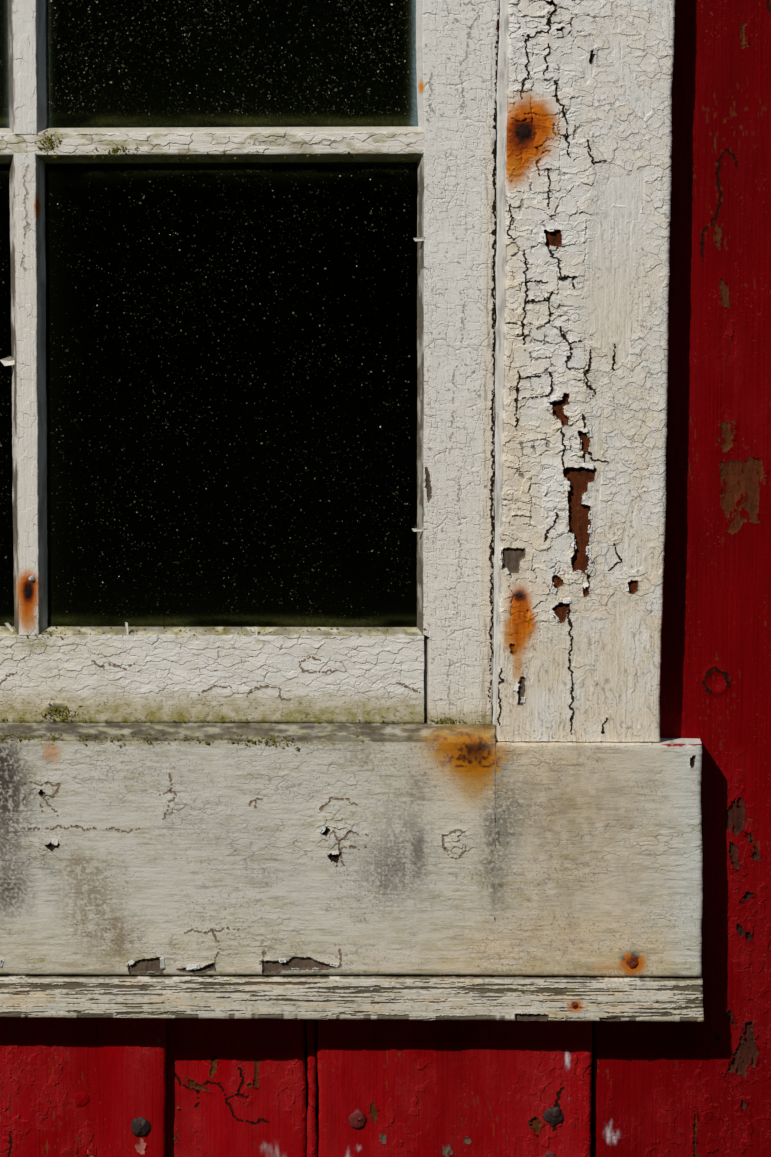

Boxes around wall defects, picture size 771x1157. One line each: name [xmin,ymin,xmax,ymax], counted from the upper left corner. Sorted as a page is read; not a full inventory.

corrosion [506,98,555,179]
peeling [541,228,562,250]
crack [396,2,616,735]
peeling [544,393,597,623]
peeling [499,547,526,575]
crack [586,543,622,586]
corrosion [508,589,535,653]
crack [198,656,337,701]
water stain [0,737,23,837]
corrosion [433,735,502,787]
water stain [0,876,20,903]
peeling [261,957,340,974]